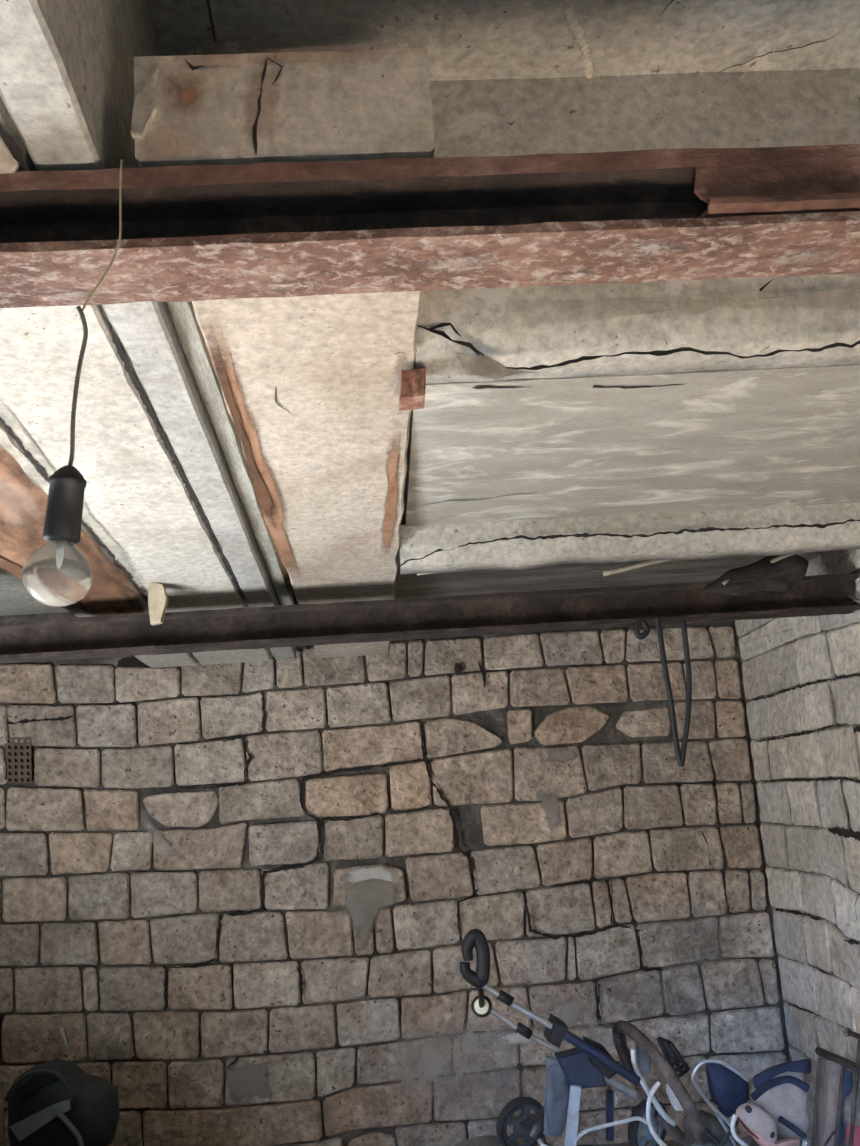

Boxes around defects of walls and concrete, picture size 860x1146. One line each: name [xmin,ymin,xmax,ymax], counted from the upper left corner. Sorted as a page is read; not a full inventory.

crack [252,56,283,156]
crack [0,123,27,170]
rust [440,258,479,269]
rust [634,244,670,255]
rust [53,291,94,299]
crack [418,323,860,389]
crack [0,417,49,481]
rust [208,349,297,569]
crack [400,519,860,566]
crack [755,724,860,742]
crack [764,776,860,784]
spalling [345,867,396,947]